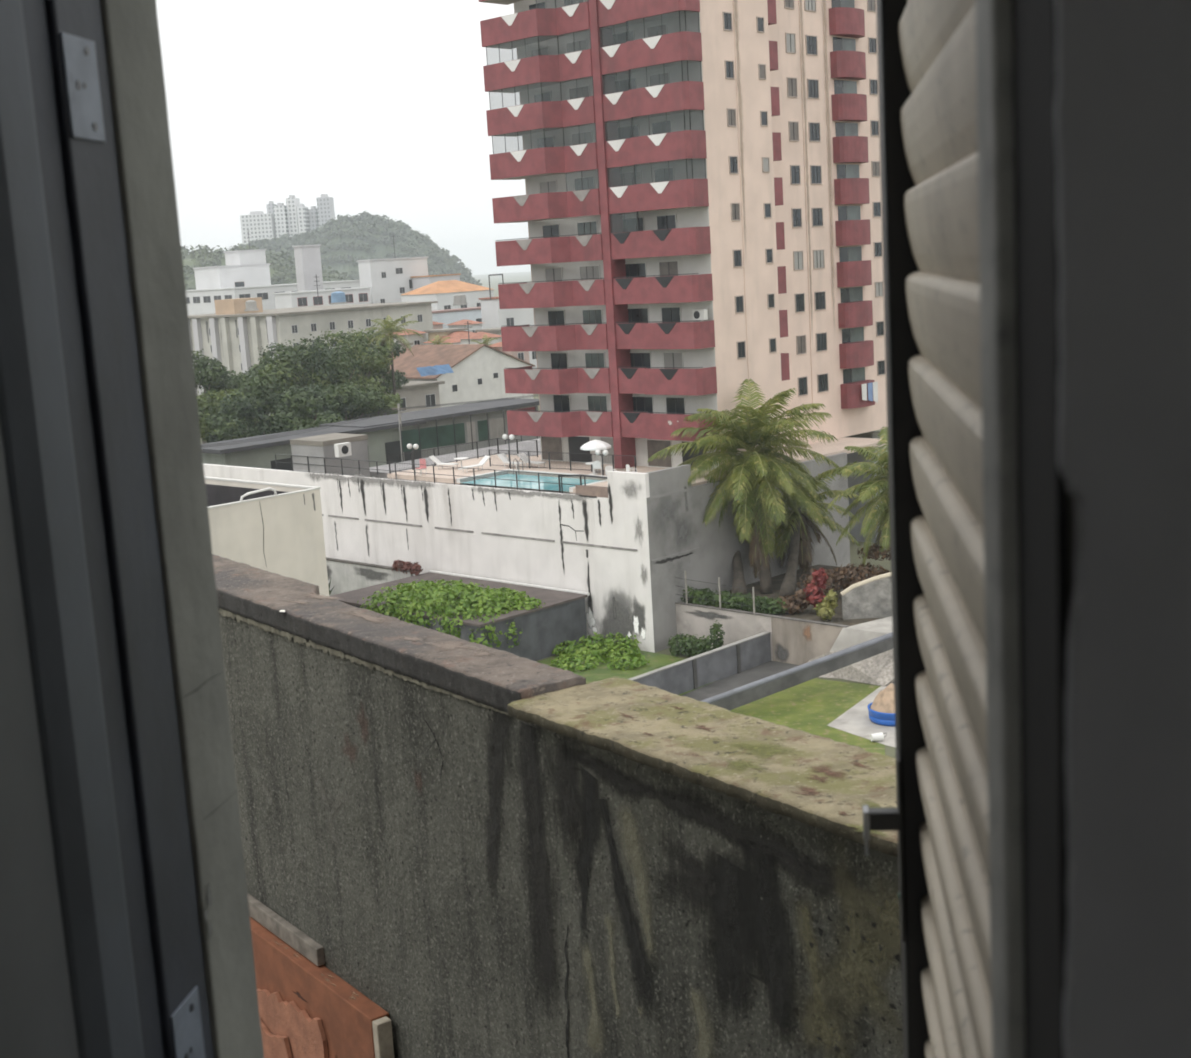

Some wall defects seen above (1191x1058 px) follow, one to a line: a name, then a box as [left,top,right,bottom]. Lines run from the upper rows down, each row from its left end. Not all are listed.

damp [472,485,645,649]
damp [487,708,853,1036]
crack [562,926,570,1058]
damp [583,946,602,1052]
damp [691,989,712,1058]